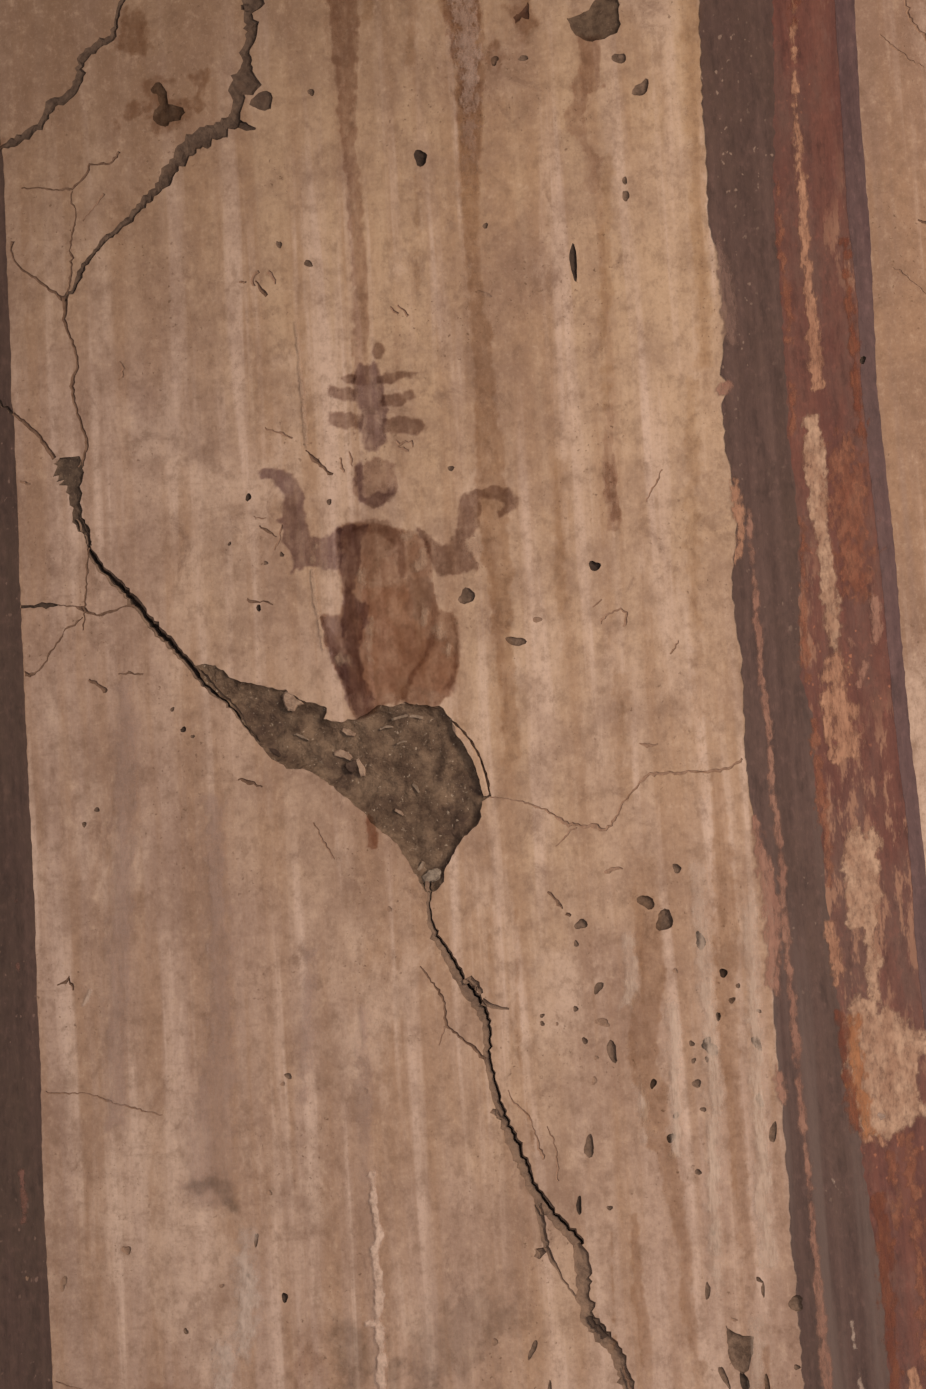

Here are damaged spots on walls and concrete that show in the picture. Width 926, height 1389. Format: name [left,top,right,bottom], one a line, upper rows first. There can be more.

spalling [513,3,529,23]
spalling [567,0,621,42]
spalling [611,54,626,64]
crack [239,270,276,297]
crack [0,0,265,743]
crack [265,427,353,475]
crack [254,516,283,550]
crack [247,597,273,605]
crack [238,778,262,788]
spalling [194,664,491,892]
crack [420,880,635,1389]